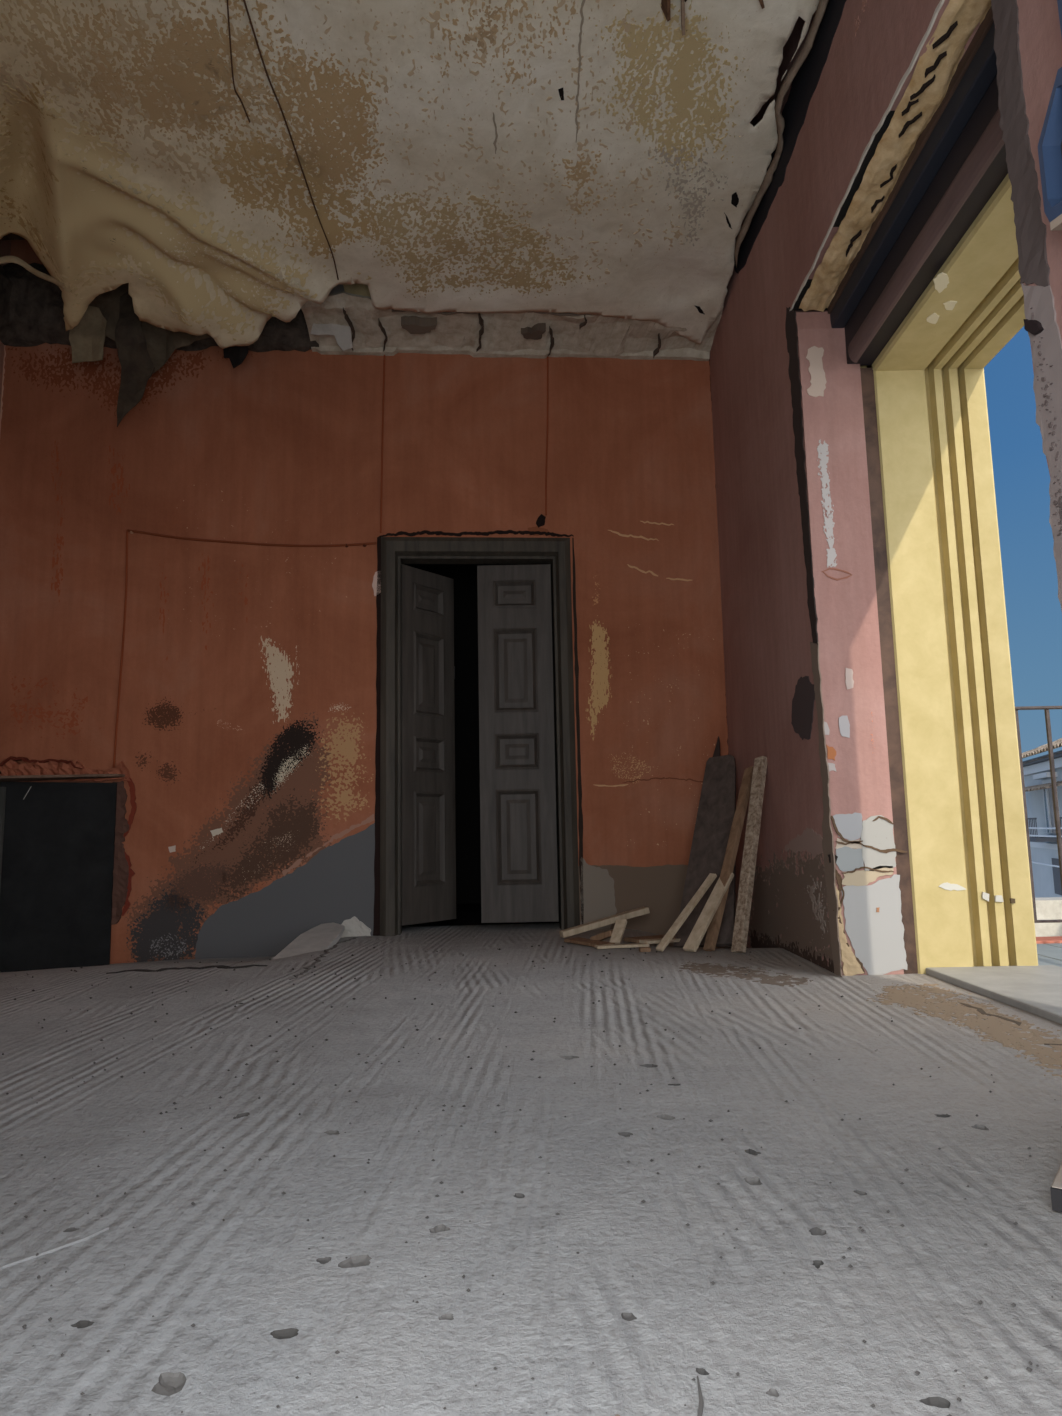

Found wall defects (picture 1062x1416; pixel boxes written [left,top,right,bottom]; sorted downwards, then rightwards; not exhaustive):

leakage [0,0,749,416]
crack [343,307,484,352]
crack [527,312,600,356]
spalling [991,0,1062,611]
leakage [142,696,217,731]
peeling [259,636,300,724]
peeling [586,574,612,740]
spalling [785,307,907,976]
leakage [196,744,310,851]
spalling [340,916,371,938]